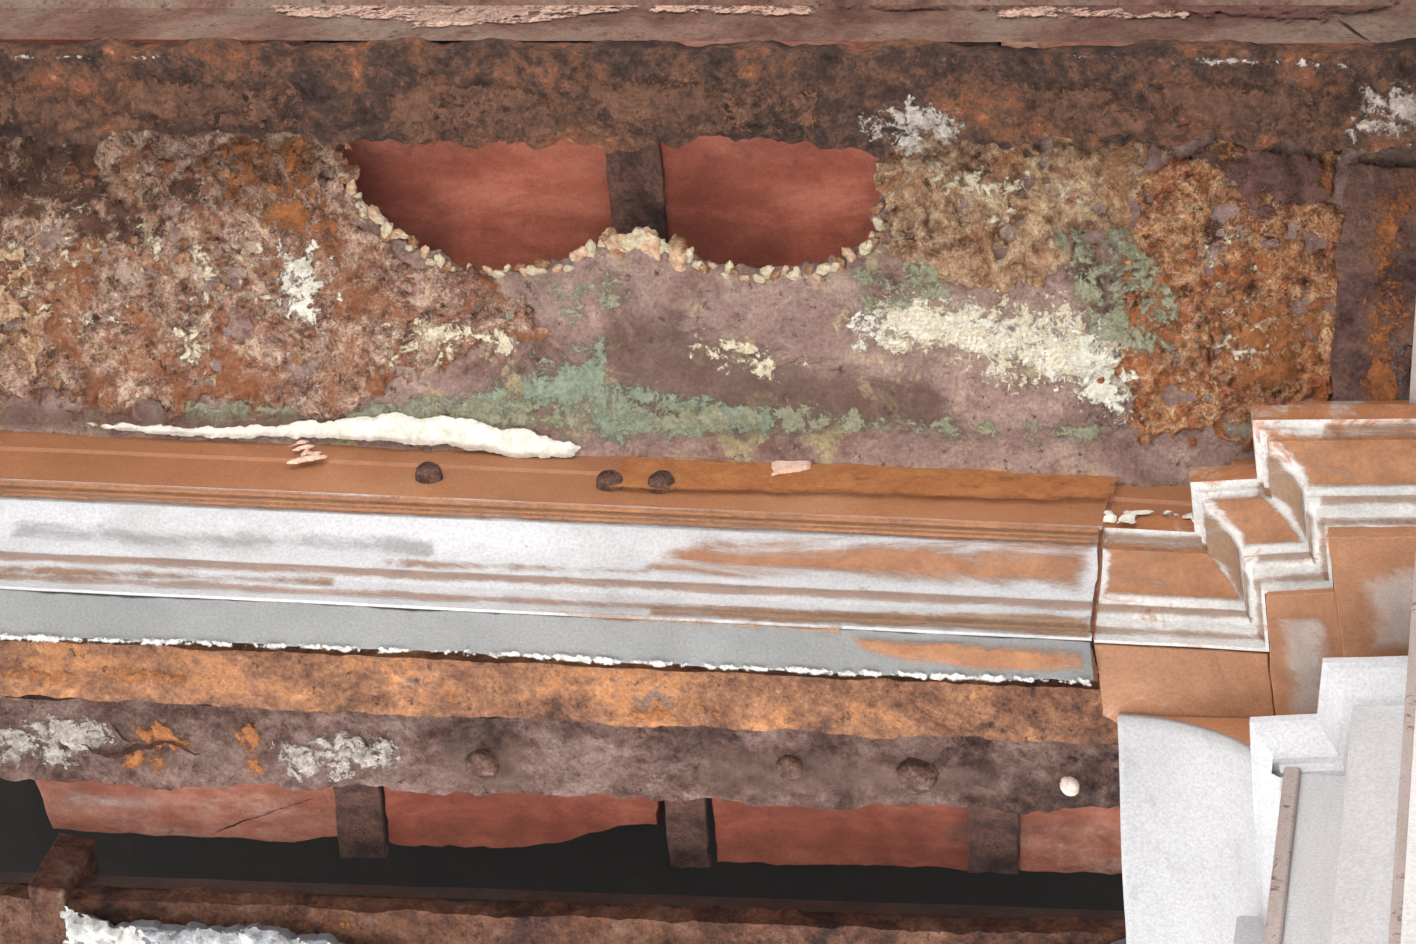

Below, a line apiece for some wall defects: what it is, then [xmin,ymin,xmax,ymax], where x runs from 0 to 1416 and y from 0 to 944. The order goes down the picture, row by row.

corrosion [857,95,967,157]
corrosion [1344,81,1416,149]
corrosion [0,247,81,377]
corrosion [0,135,340,254]
flaking render [338,173,887,283]
damp [681,319,825,384]
damp [845,278,1148,424]
corrosion [1168,144,1329,390]
corrosion [0,423,1416,670]
corrosion [0,713,191,775]
corrosion [228,723,404,783]
flaking render [59,906,306,944]